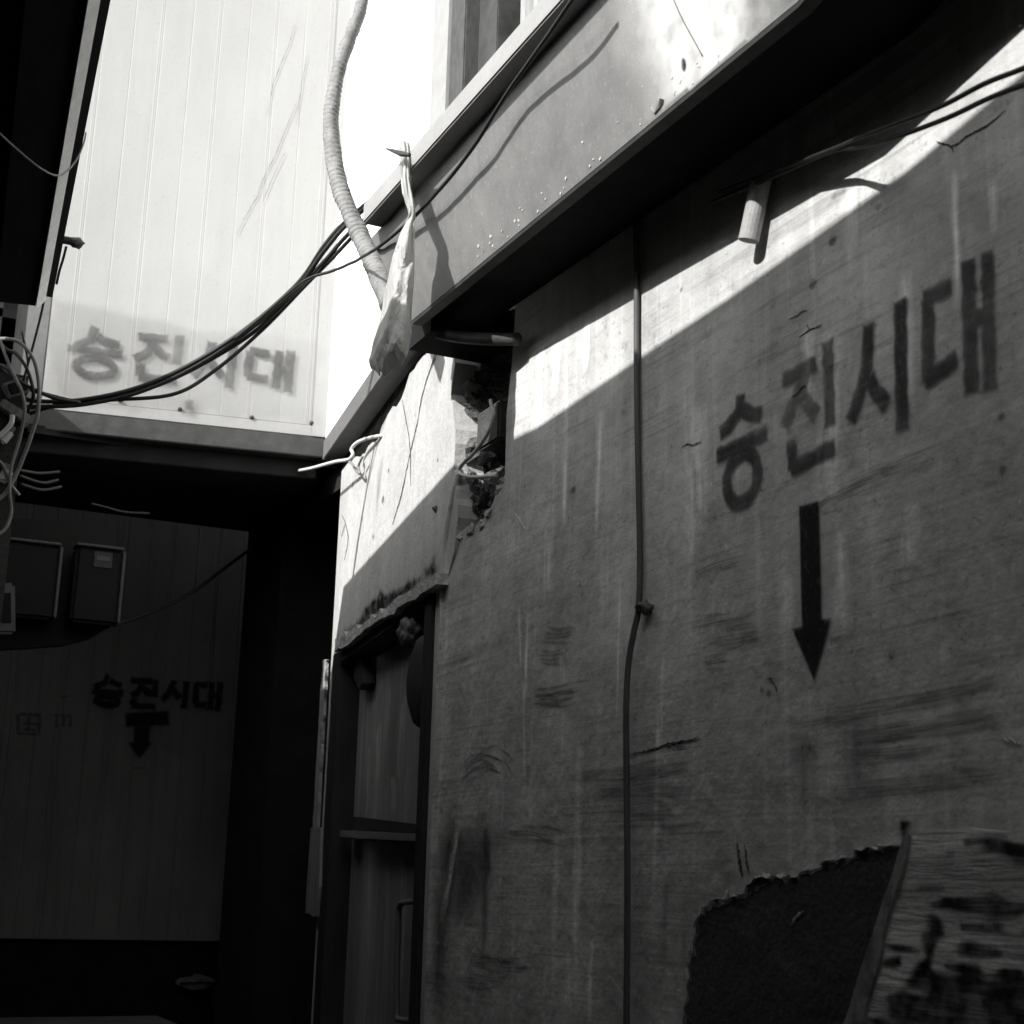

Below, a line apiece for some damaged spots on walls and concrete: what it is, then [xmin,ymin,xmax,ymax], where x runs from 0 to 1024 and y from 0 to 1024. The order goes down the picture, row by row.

crack [937,110,1005,153]
spalling [456,348,513,543]
crack [631,737,699,755]
flaking render [682,841,900,1024]